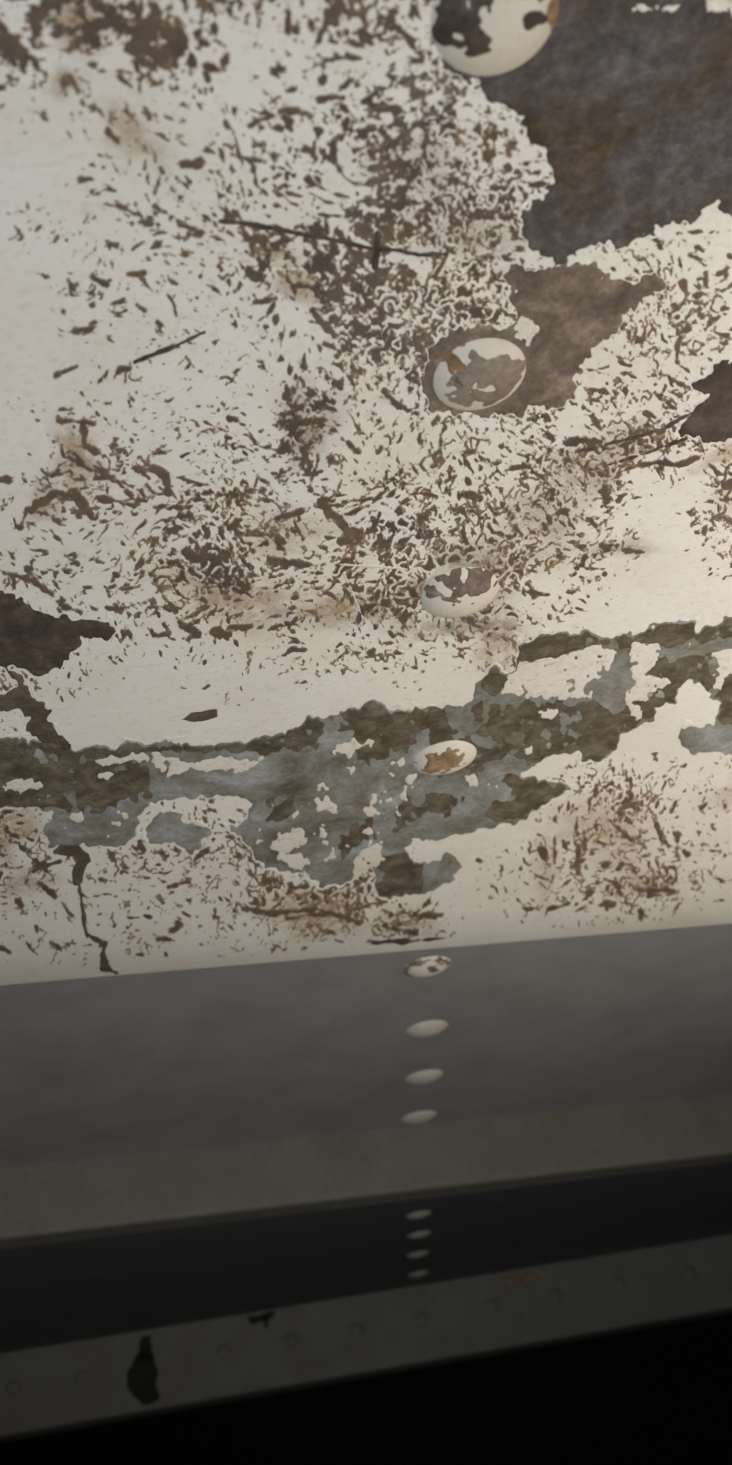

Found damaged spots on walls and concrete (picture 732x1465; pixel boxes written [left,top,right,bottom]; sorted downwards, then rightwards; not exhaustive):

crack [31,845,119,975]
peeling [0,0,732,966]